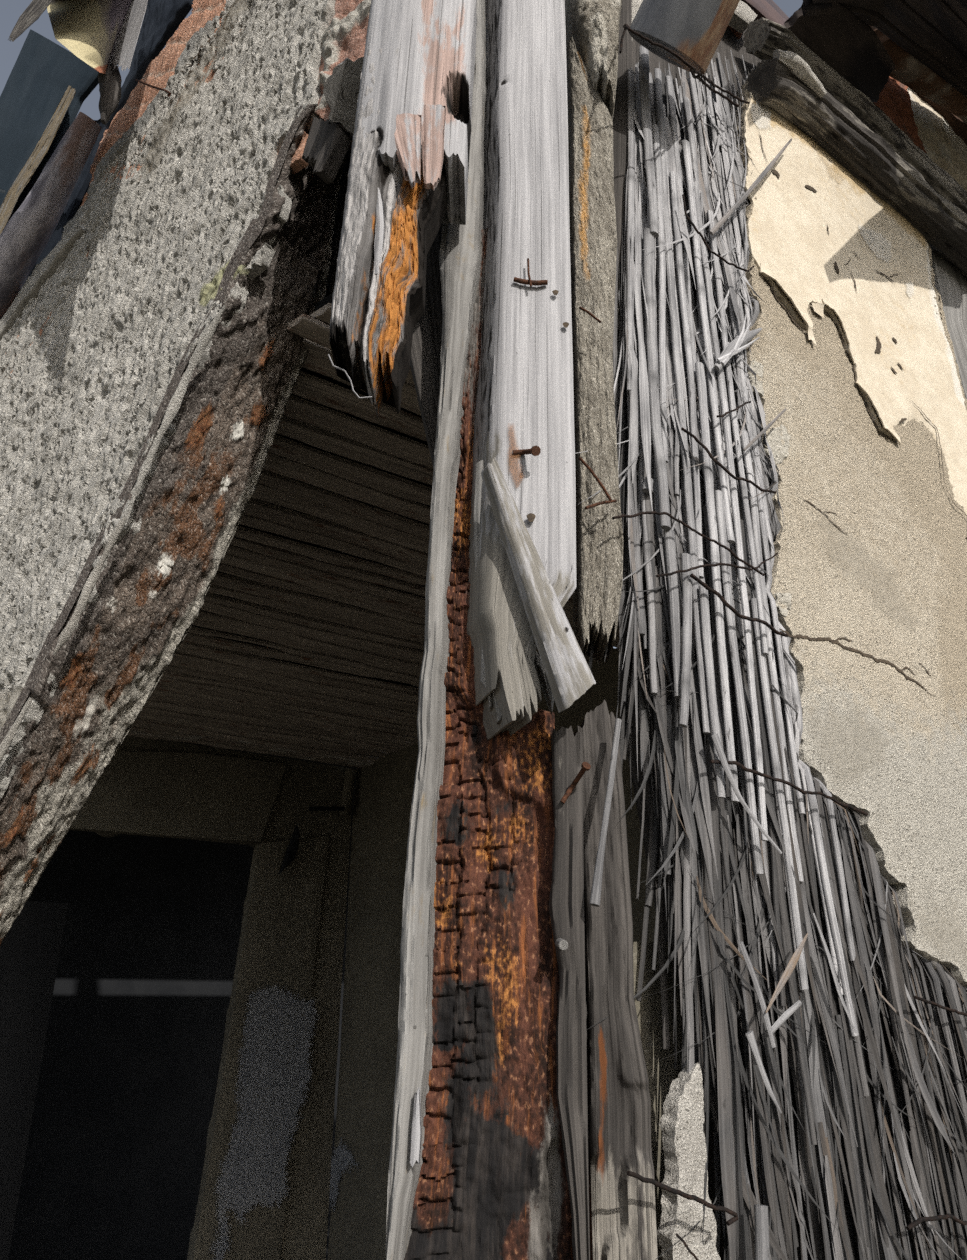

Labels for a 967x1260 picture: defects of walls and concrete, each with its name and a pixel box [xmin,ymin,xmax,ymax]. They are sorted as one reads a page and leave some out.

flaking render [760,261,858,364]
spalling [748,360,764,397]
rust [185,406,212,448]
spalling [764,424,791,464]
flaking render [855,380,907,445]
crack [771,625,936,696]
rust [73,744,94,784]